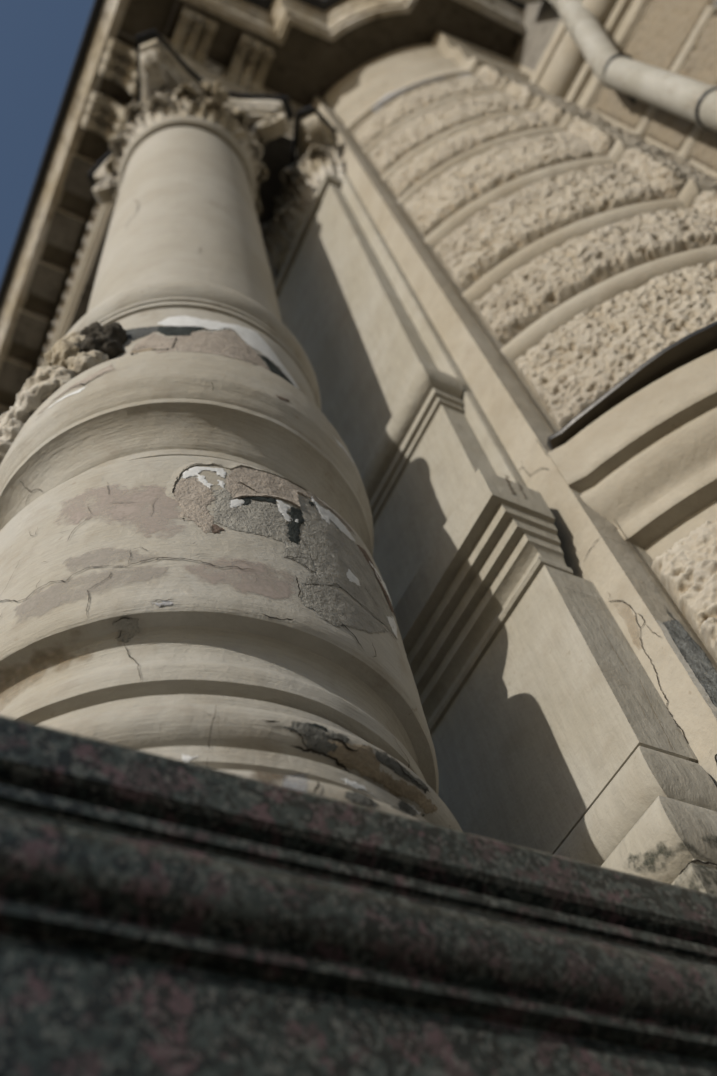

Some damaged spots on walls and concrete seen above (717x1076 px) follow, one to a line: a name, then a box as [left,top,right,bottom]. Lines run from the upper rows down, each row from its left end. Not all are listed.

peeling [126,316,300,390]
crack [1,547,257,613]
peeling [164,461,398,657]
crack [609,594,688,743]
peeling [656,612,717,720]
spalling [263,720,438,817]
water stain [629,837,717,893]